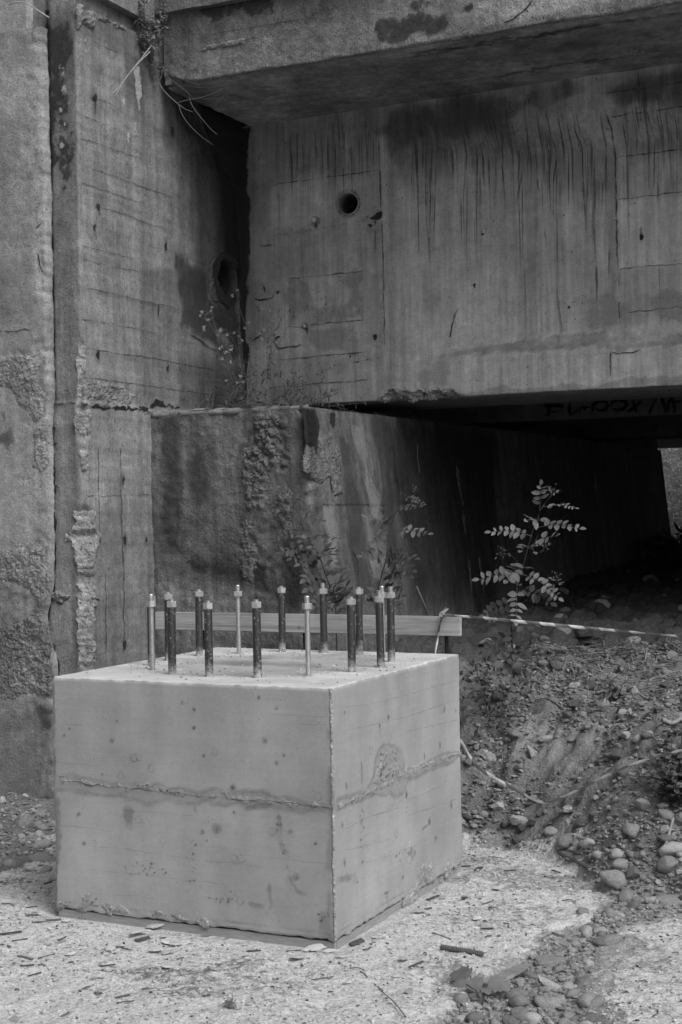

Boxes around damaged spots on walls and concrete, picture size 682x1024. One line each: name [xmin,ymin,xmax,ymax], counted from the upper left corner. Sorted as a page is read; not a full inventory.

water stain [45,22,86,189]
water stain [123,67,142,108]
spalling [54,344,180,472]
spalling [51,509,102,667]